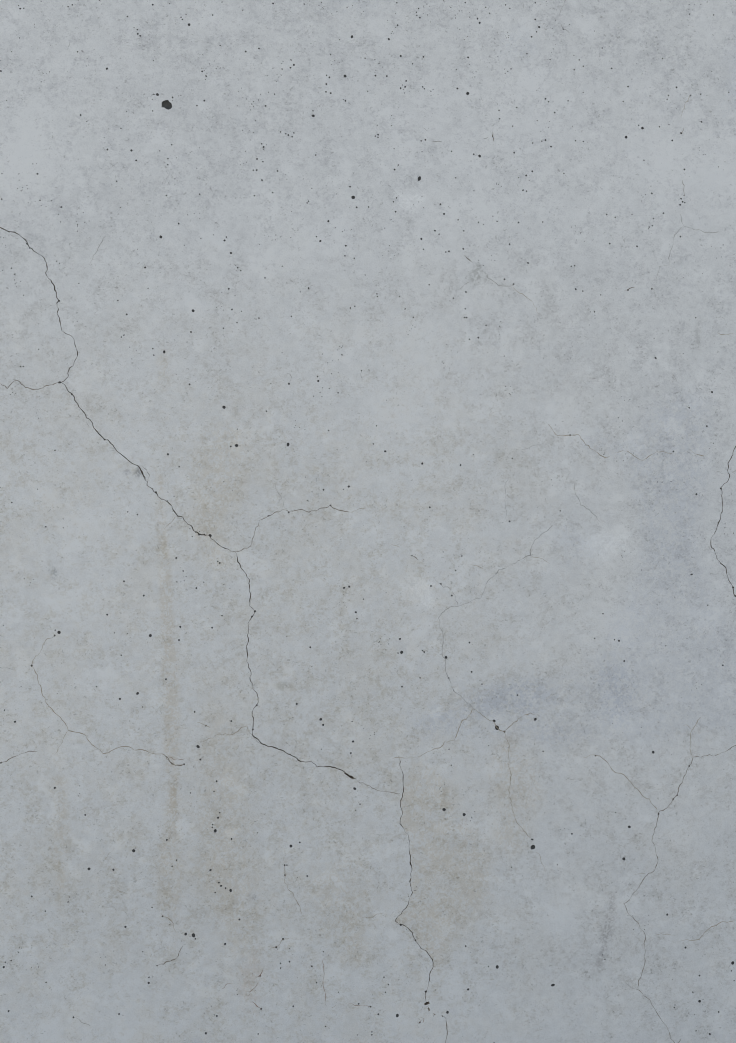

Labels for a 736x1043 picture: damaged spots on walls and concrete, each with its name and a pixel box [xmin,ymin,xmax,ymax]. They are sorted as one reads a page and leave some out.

crack [624,180,717,297]
crack [0,227,551,1043]
crack [505,424,736,596]
crack [589,717,736,1043]